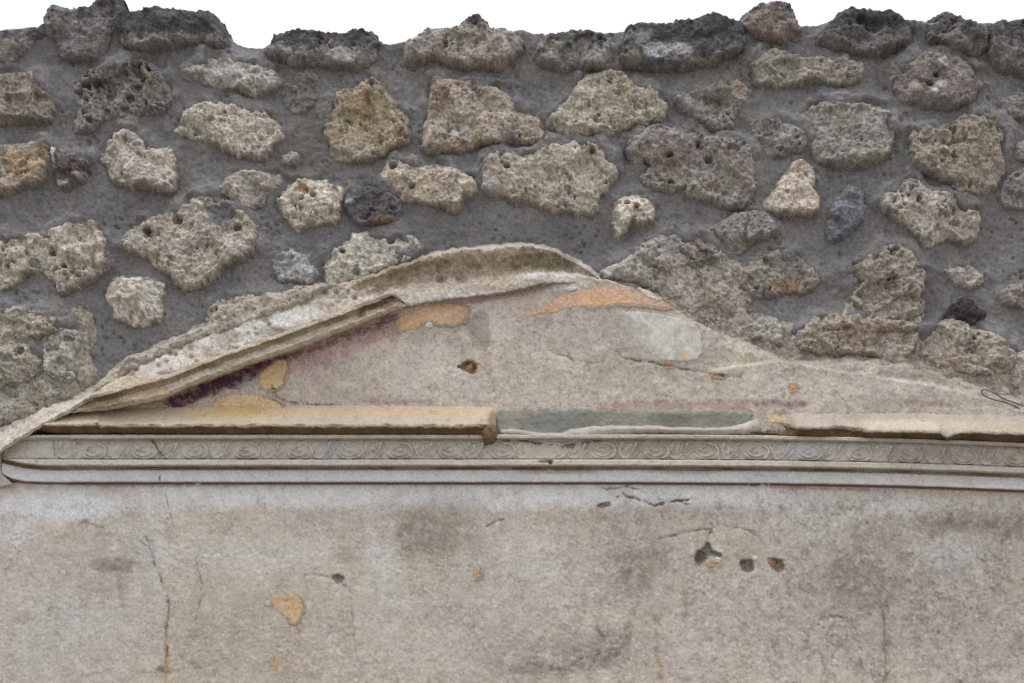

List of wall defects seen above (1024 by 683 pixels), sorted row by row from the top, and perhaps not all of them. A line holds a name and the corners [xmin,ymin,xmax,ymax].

flaking render [395,303,471,330]
flaking render [517,286,675,321]
spalling [457,361,477,374]
flaking render [212,359,290,408]
crack [604,486,690,507]
spalling [689,543,721,568]
spalling [740,556,784,572]
flaking render [265,594,306,625]